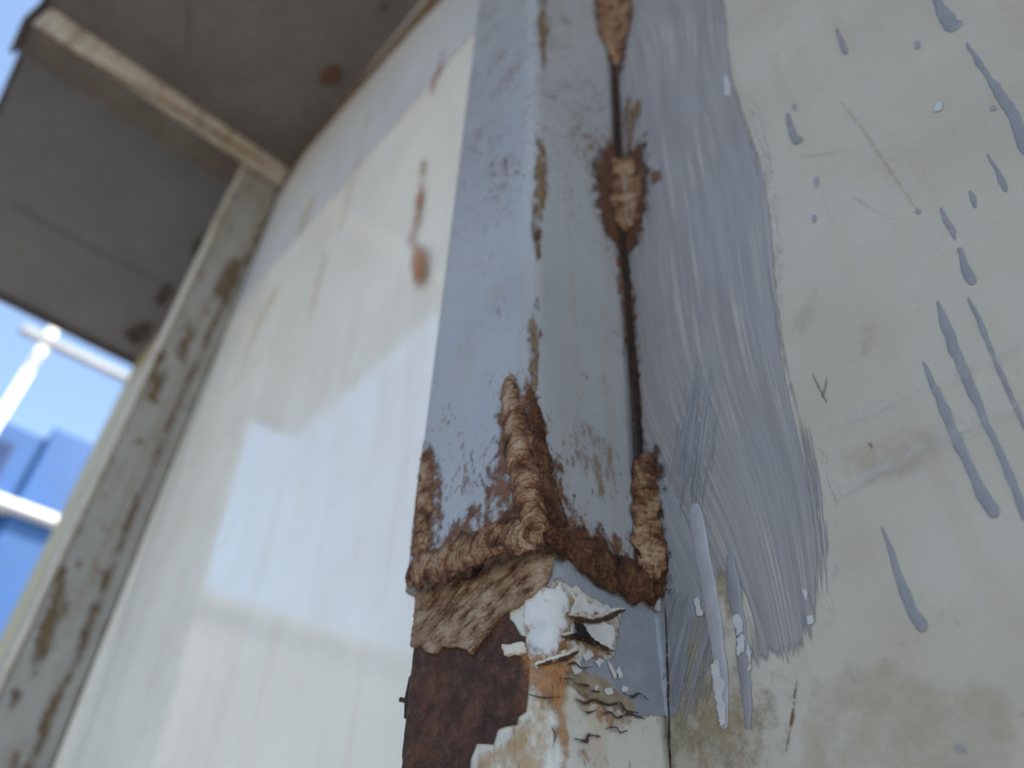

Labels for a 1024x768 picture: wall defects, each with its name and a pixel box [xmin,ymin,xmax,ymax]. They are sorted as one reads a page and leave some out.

rust [531,139,548,259]
rust [572,96,661,254]
rust [22,0,441,768]
rust [410,398,521,556]
rust [514,298,641,563]
rust [640,444,666,490]
rust [402,612,573,768]
peeling [410,550,637,713]
rust [648,553,672,605]
peeling [711,659,726,726]
peeling [720,574,752,671]